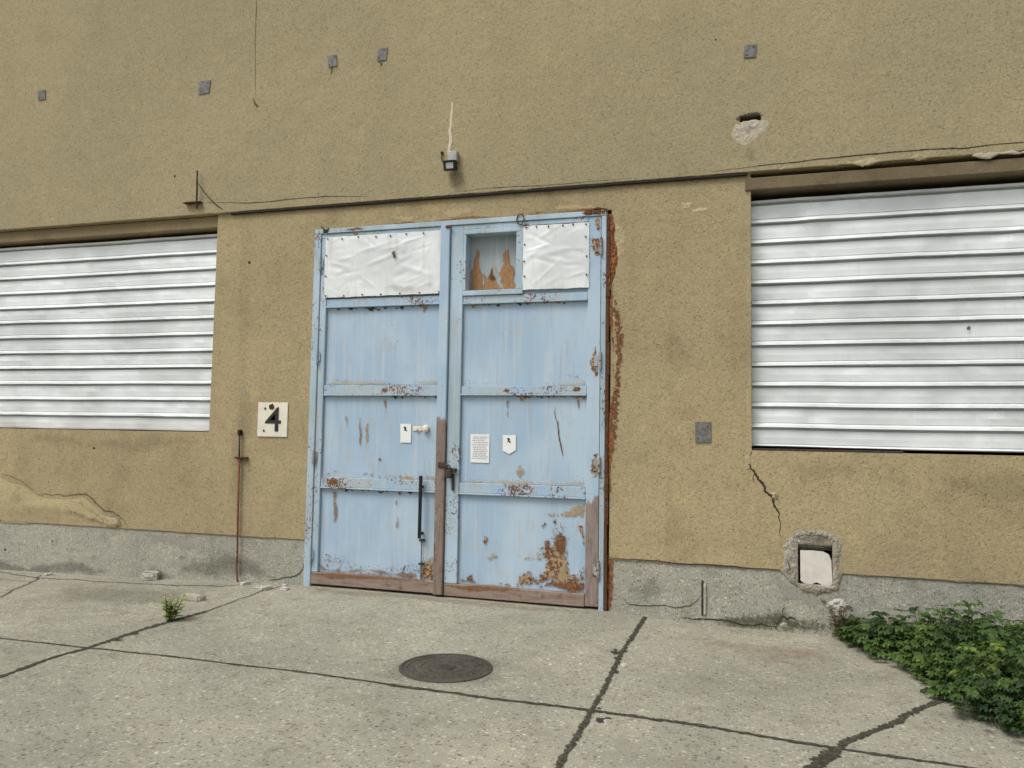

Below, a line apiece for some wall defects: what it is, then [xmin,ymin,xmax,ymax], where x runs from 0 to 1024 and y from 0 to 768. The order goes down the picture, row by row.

spalling [732,111,768,146]
corrosion [590,291,624,493]
crack [745,452,781,536]
corrosion [317,554,433,581]
corrosion [448,504,585,592]
spalling [780,529,853,617]